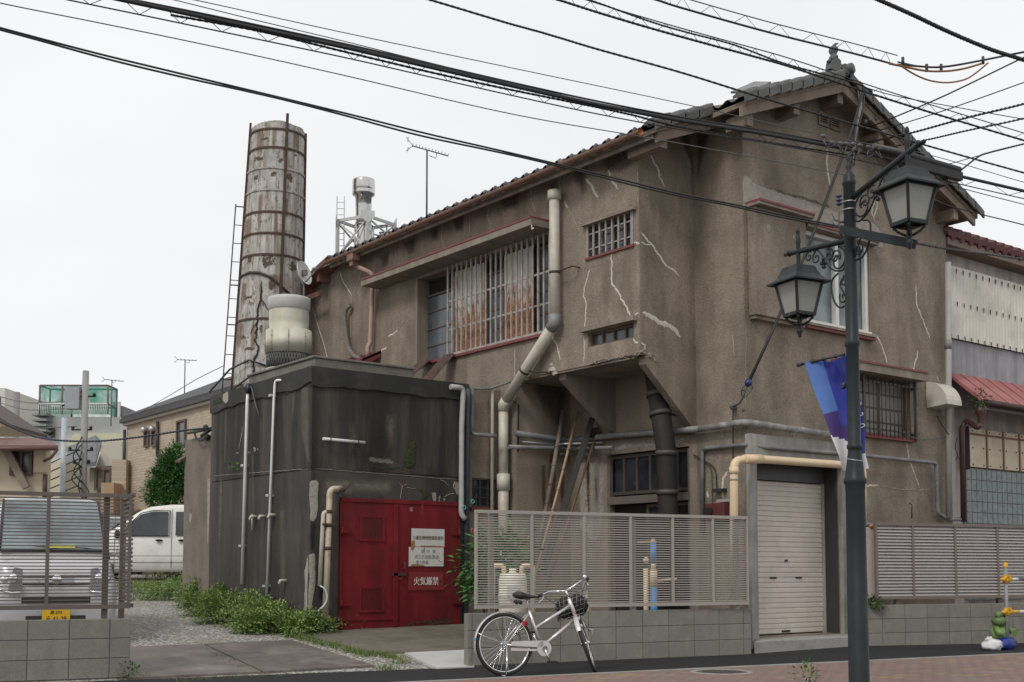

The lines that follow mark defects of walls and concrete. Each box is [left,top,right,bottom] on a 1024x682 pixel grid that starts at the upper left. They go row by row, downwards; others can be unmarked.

rust [245,195,262,241]
crack [250,281,268,373]
crack [552,233,681,361]
crack [913,289,940,382]
spalling [309,480,319,521]
spalling [304,553,316,626]